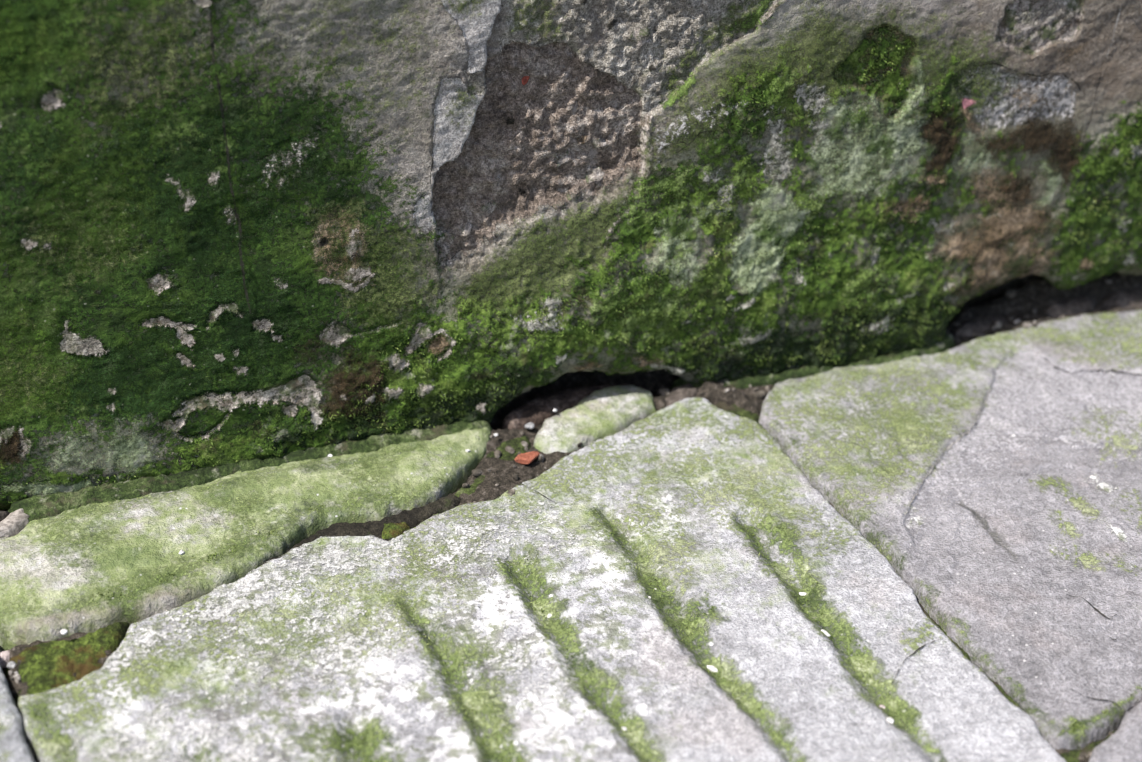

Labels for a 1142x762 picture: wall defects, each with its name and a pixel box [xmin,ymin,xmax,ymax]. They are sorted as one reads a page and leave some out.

crack [979,9,1121,142]
spalling [412,0,787,298]
crack [1045,358,1142,375]